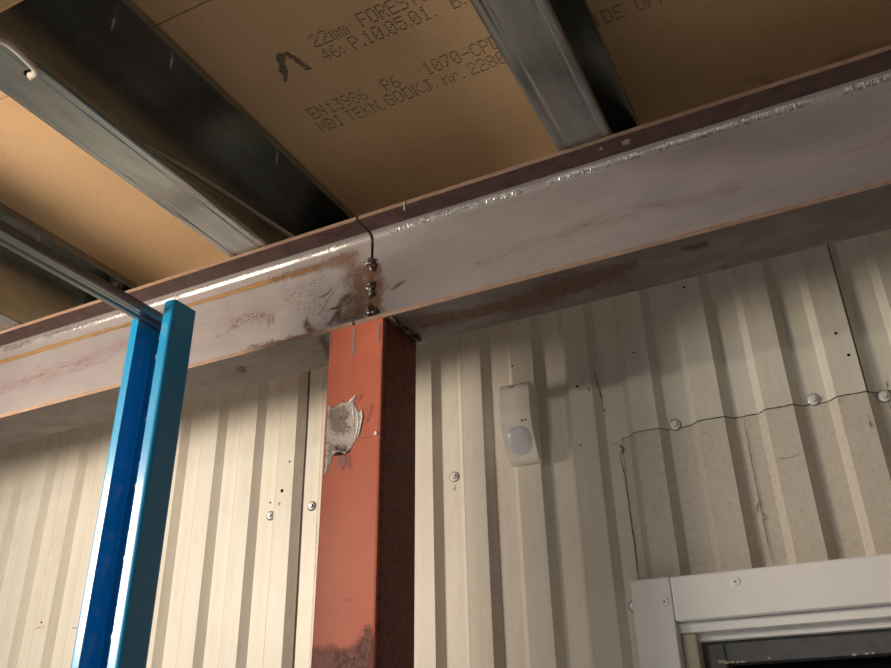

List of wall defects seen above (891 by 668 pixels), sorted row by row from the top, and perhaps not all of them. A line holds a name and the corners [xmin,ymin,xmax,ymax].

rust [186,253,381,320]
rust [0,321,132,364]
peeling [324,394,377,475]
crack [611,382,891,576]